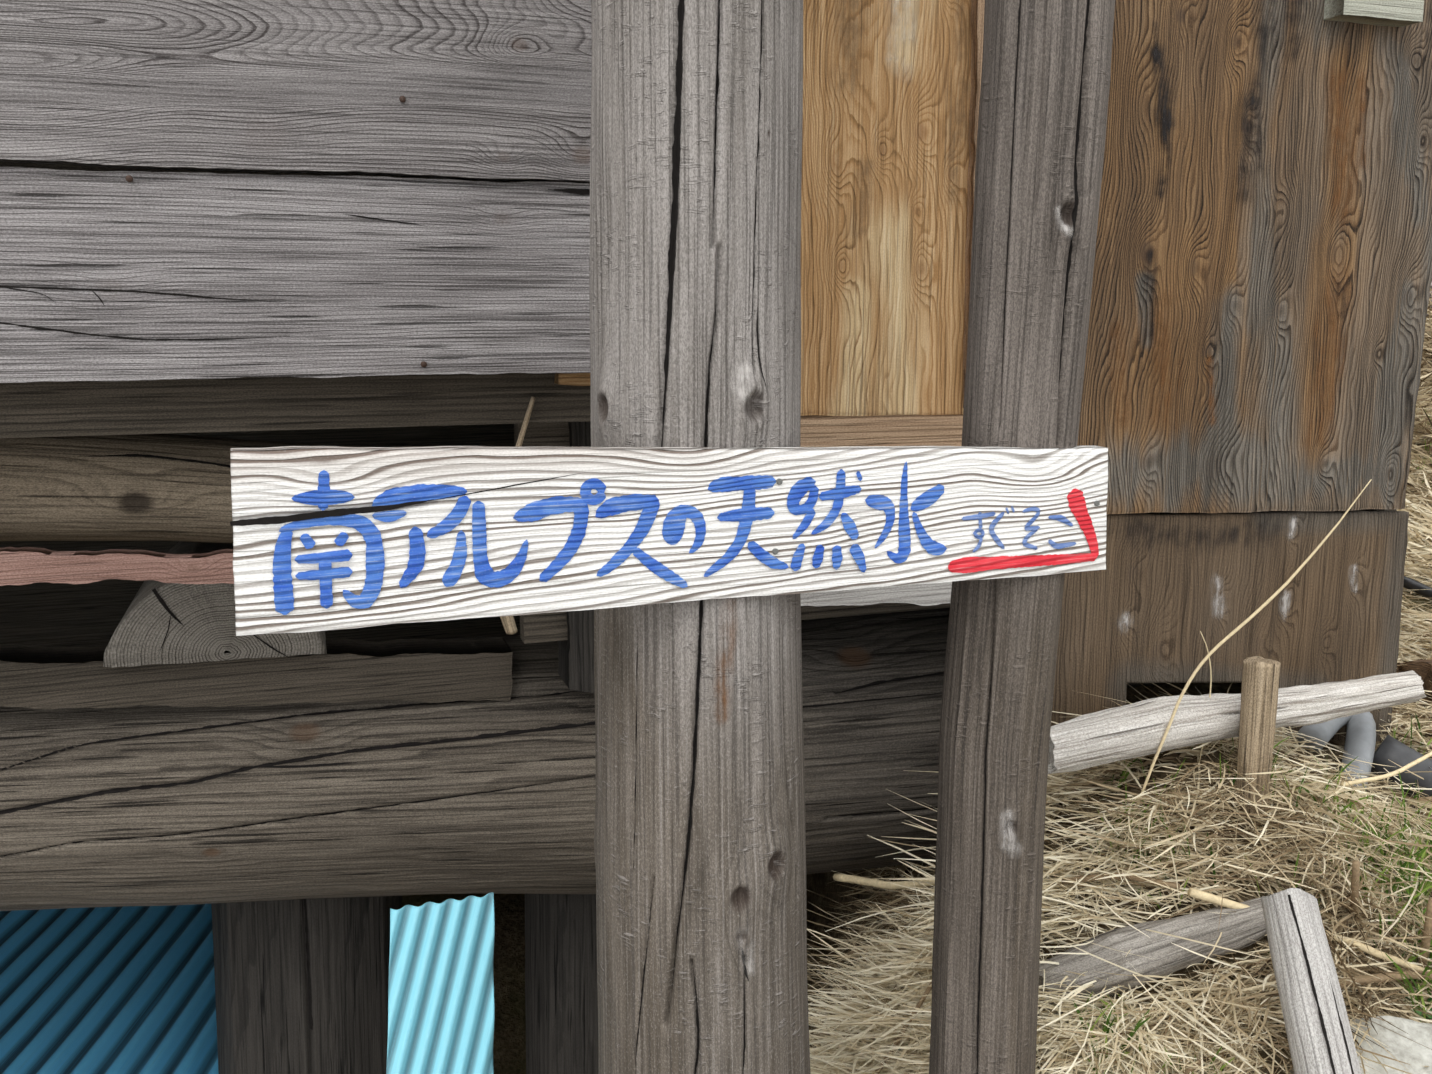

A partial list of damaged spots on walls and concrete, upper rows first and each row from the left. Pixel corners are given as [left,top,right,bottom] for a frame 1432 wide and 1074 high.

crack [661,0,684,447]
crack [704,0,720,447]
crack [752,0,767,389]
crack [0,691,595,815]
crack [4,776,591,856]
crack [632,600,703,1074]